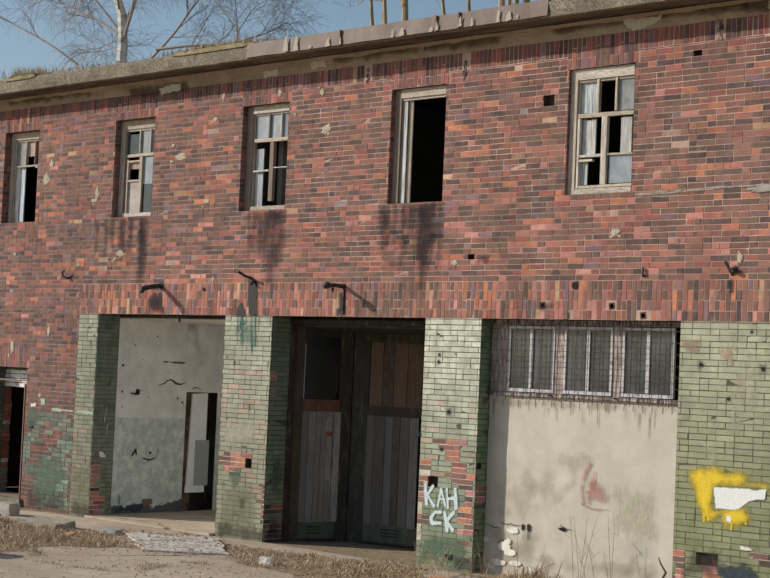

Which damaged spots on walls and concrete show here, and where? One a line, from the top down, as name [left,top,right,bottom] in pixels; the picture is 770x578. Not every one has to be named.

water stain [402,204,434,258]
water stain [150,295,162,310]
peeling [416,438,489,547]
flaking render [485,524,535,573]